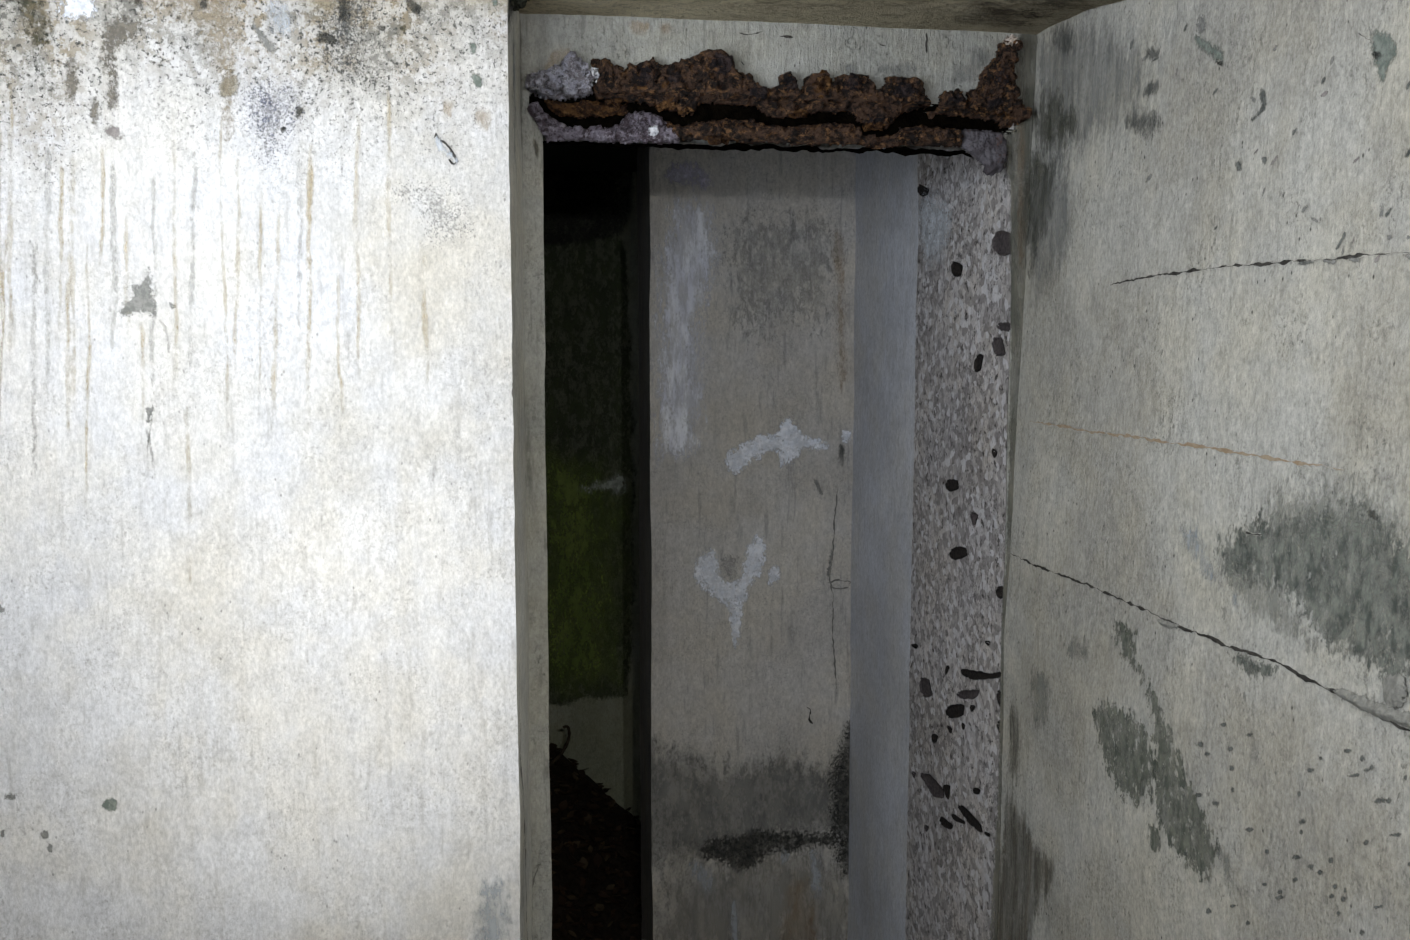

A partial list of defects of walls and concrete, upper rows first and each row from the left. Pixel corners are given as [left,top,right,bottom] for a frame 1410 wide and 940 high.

damp [0,0,311,169]
damp [306,0,421,94]
damp [508,0,599,111]
rust [709,49,735,76]
rust [529,64,1017,137]
crack [1110,250,1410,286]
damp [725,418,851,475]
damp [964,0,1161,940]
crack [1009,552,1410,732]
damp [1187,480,1410,728]
damp [651,720,850,940]
damp [1092,620,1229,882]